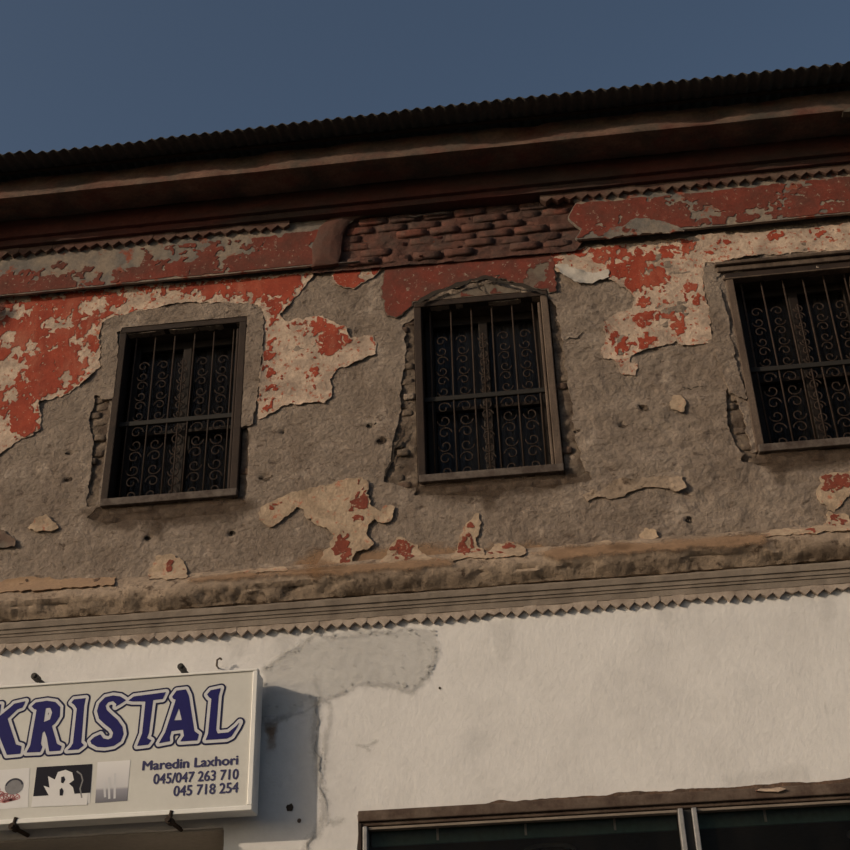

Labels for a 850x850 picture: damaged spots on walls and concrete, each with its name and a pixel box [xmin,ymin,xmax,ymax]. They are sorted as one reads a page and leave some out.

peeling [0,176,850,514]
peeling [28,514,59,532]
peeling [258,477,395,564]
peeling [377,513,527,564]
peeling [761,471,850,538]